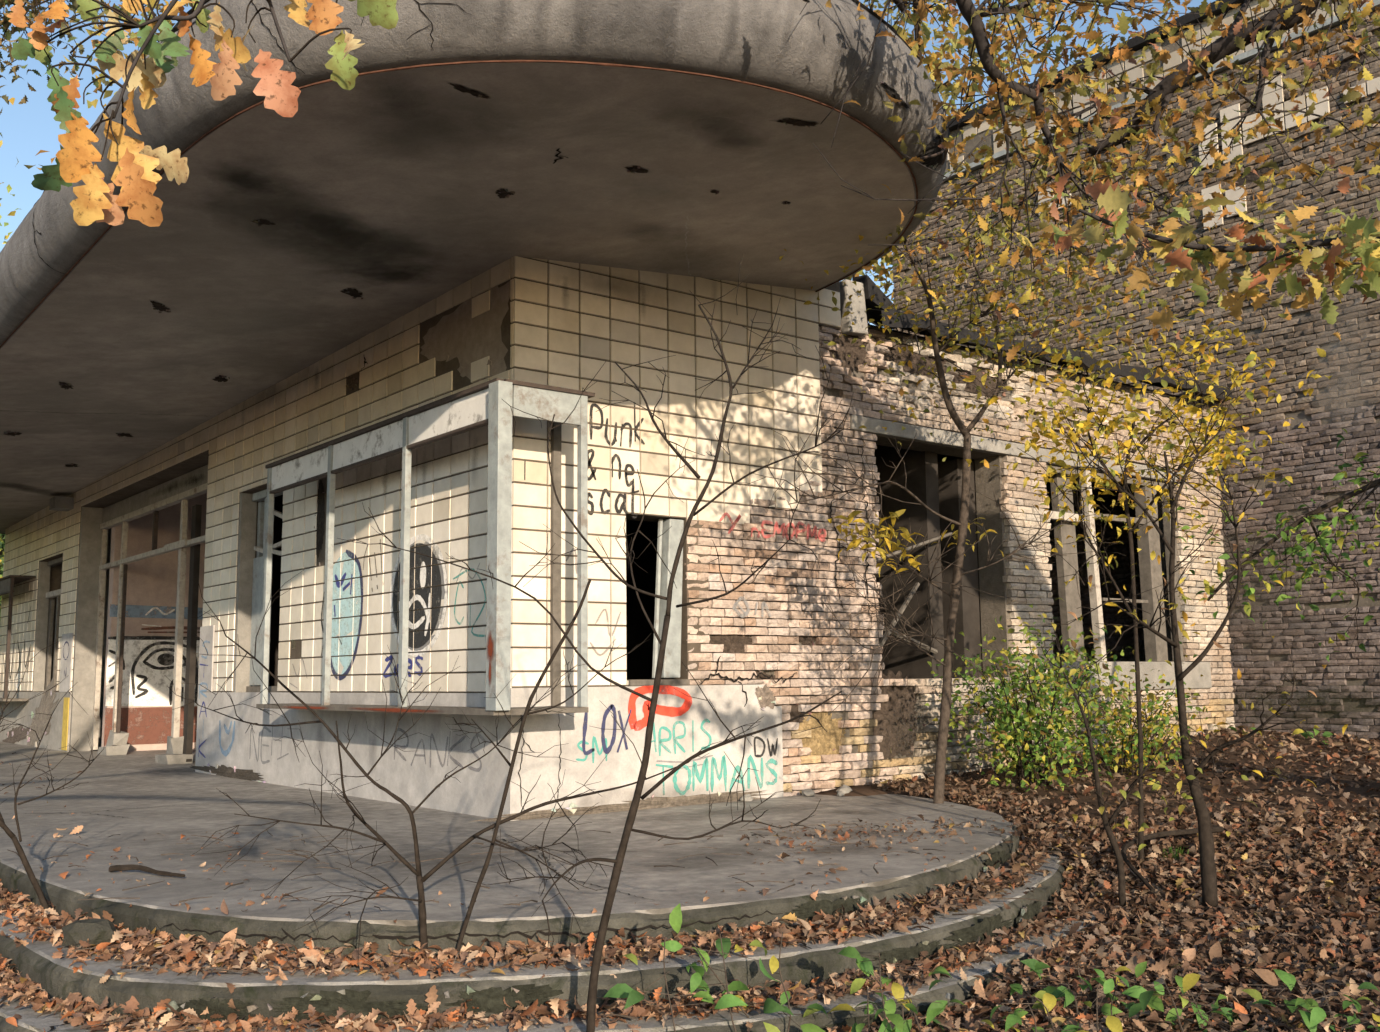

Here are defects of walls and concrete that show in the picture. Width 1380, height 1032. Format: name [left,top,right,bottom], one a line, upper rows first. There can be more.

peeling [420,281,510,381]
spalling [709,626,846,764]